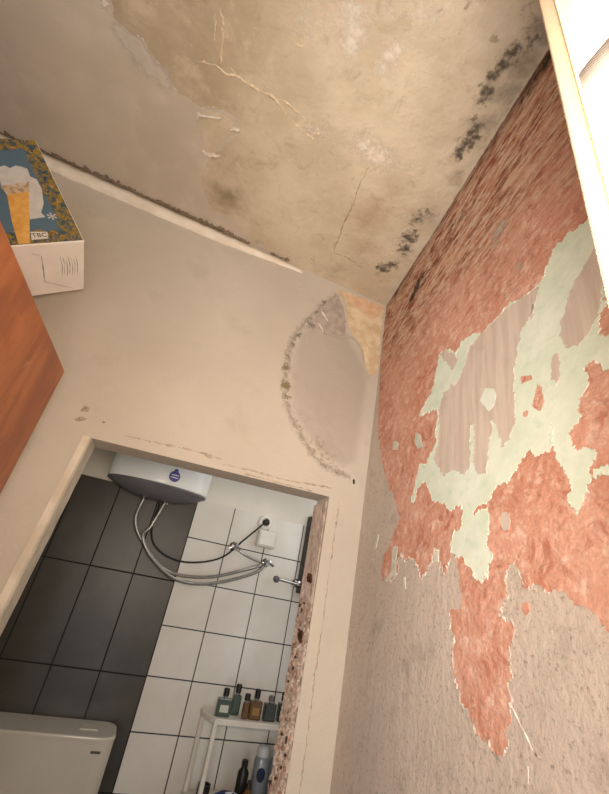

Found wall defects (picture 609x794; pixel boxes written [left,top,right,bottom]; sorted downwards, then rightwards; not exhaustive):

crack [197,11,328,146]
damp [480,45,520,103]
damp [519,50,551,104]
damp [455,119,480,160]
peeling [111,0,609,762]
flaking render [268,731,288,794]